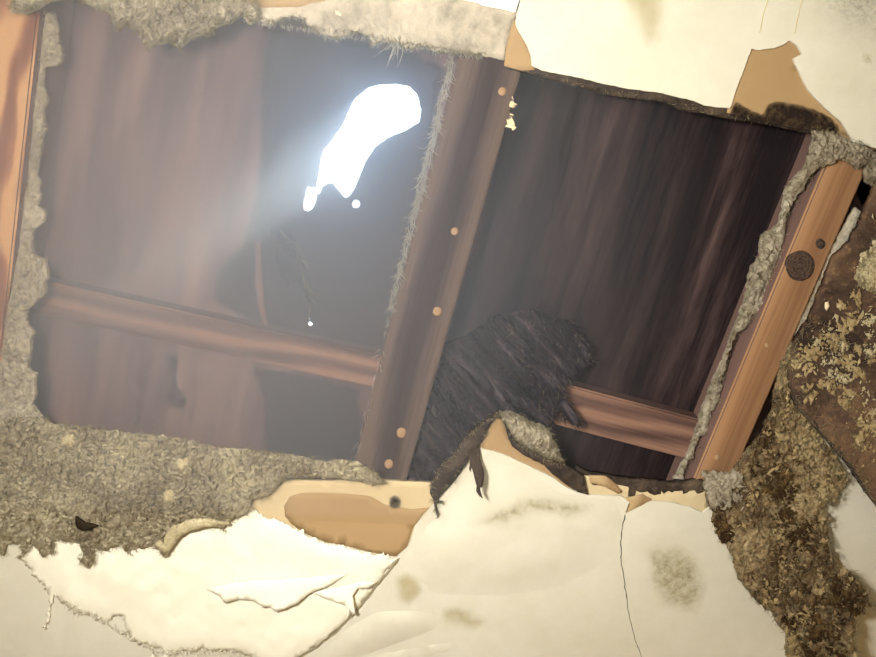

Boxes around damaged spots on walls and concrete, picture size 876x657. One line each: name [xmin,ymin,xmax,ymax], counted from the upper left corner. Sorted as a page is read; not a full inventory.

peeling [229,0,325,12]
peeling [504,19,535,71]
peeling [505,96,517,131]
peeling [727,41,850,140]
peeling [478,417,572,489]
peeling [251,478,434,556]
peeling [206,574,377,617]
crack [620,515,642,657]